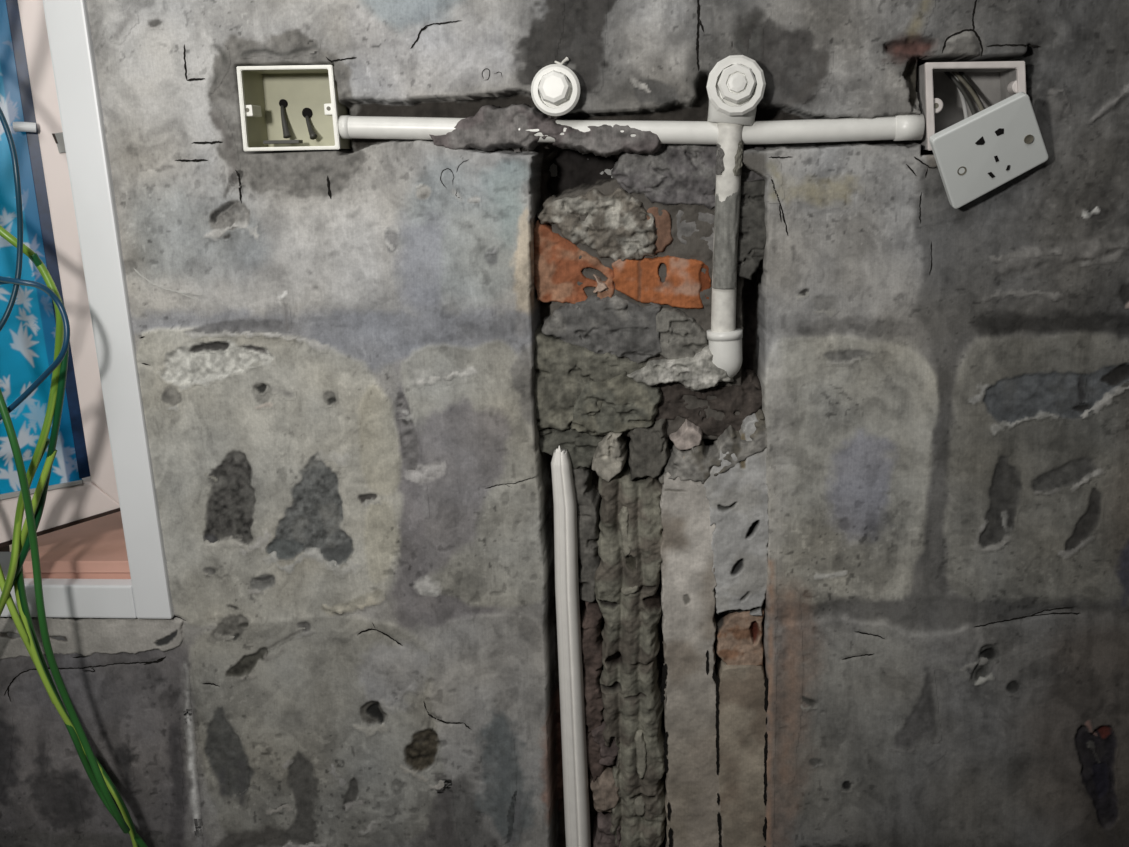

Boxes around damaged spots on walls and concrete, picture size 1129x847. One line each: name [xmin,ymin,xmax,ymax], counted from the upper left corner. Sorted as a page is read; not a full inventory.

spalling [156,290,330,412]
flaking render [966,360,1129,437]
flaking render [198,446,385,596]
flaking render [970,453,1106,561]
spalling [204,587,386,681]
crack [975,607,1079,627]
spalling [396,711,461,793]
spalling [1072,718,1122,847]